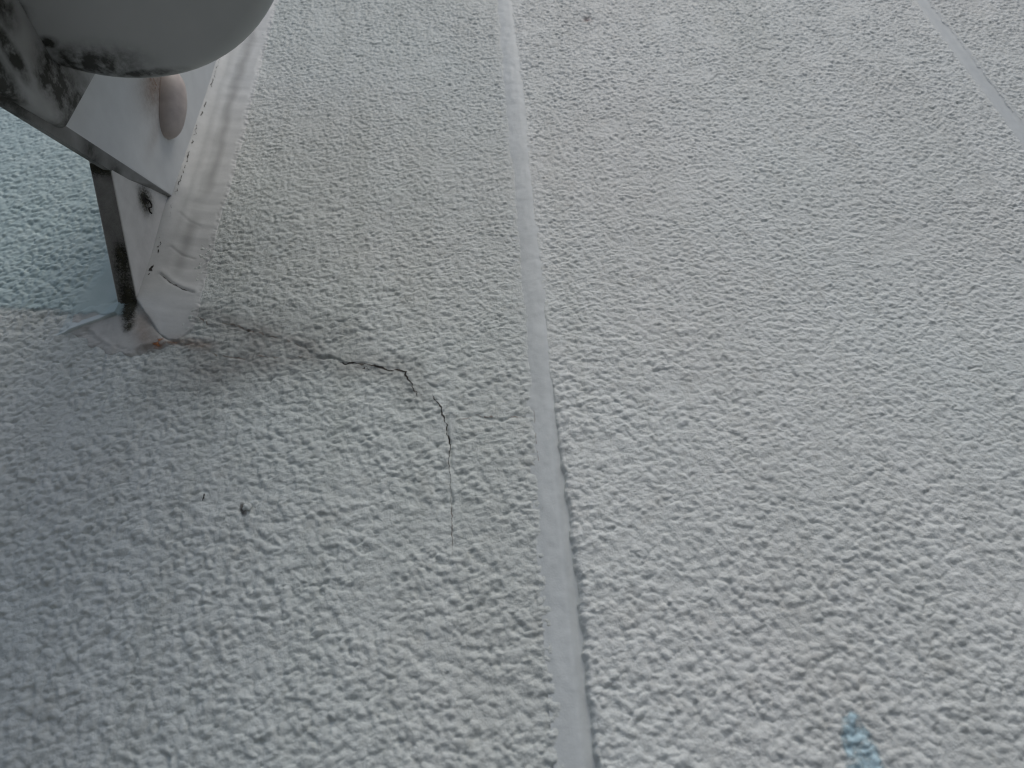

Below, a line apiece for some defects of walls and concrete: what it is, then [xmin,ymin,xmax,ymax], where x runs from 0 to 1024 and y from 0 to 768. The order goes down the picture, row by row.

crack [197,316,539,548]